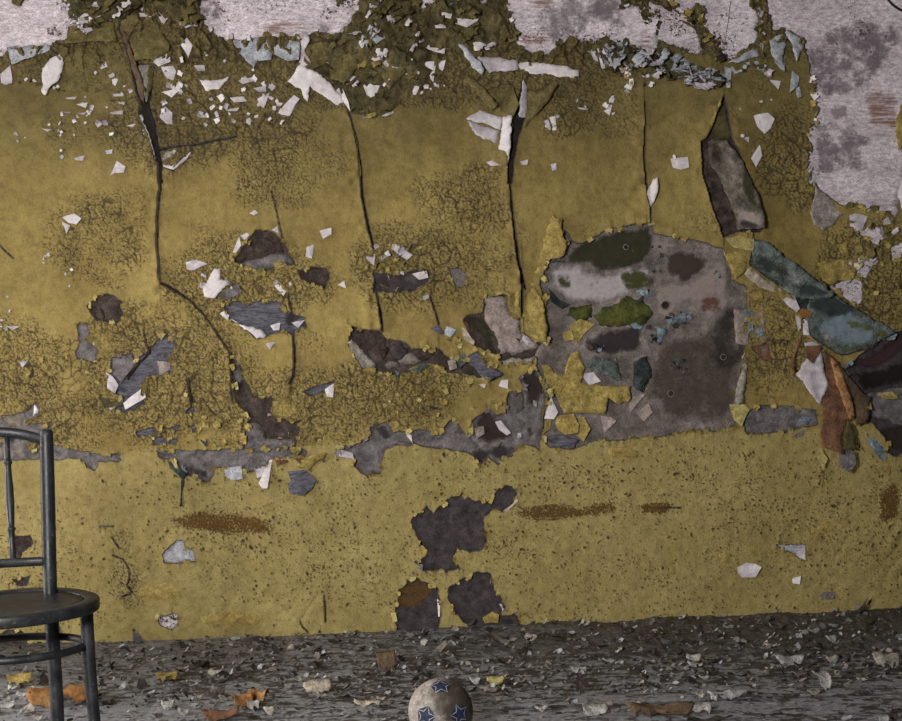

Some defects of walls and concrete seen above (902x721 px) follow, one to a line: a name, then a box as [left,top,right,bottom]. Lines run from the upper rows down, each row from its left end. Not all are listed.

crack [64,14,237,332]
crack [279,65,374,248]
peeling [0,0,902,507]
crack [458,44,557,343]
crack [643,102,651,216]
crack [127,334,151,380]
peeling [391,485,521,630]